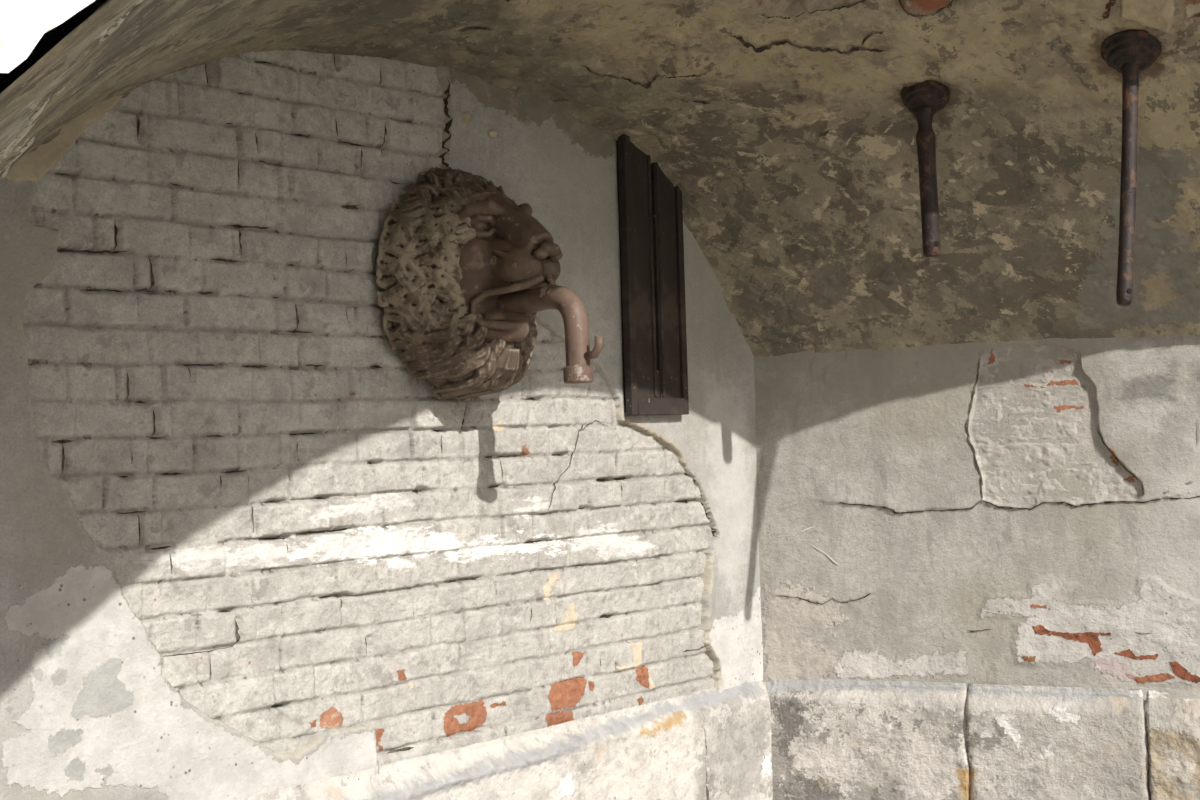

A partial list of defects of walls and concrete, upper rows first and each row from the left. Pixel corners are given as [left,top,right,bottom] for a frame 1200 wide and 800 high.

crack [730,0,885,55]
crack [899,0,953,17]
crack [439,80,453,167]
crack [582,65,717,105]
peeling [968,135,1200,509]
spalling [0,0,720,800]
crack [548,420,606,510]
crack [841,360,1200,514]
peeling [705,570,977,693]
peeling [967,573,1200,690]
peeling [782,709,971,800]
spalling [1128,707,1200,800]